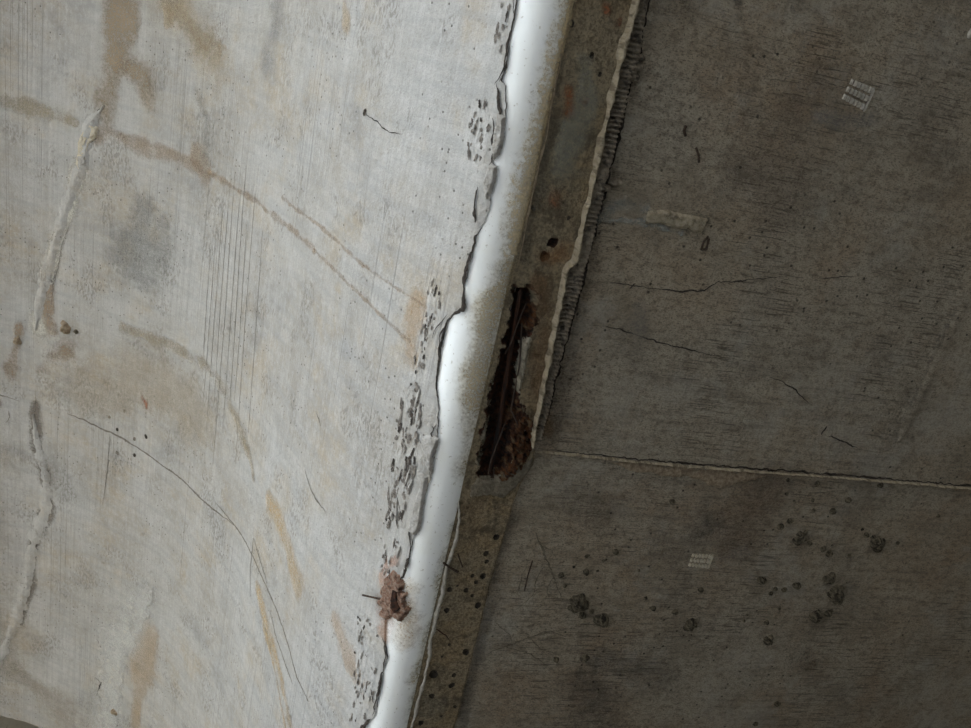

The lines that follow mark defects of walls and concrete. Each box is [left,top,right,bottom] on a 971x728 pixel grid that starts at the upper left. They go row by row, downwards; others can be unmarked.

crack [50,212,73,307]
peeling [349,2,515,728]
spalling [473,279,547,481]